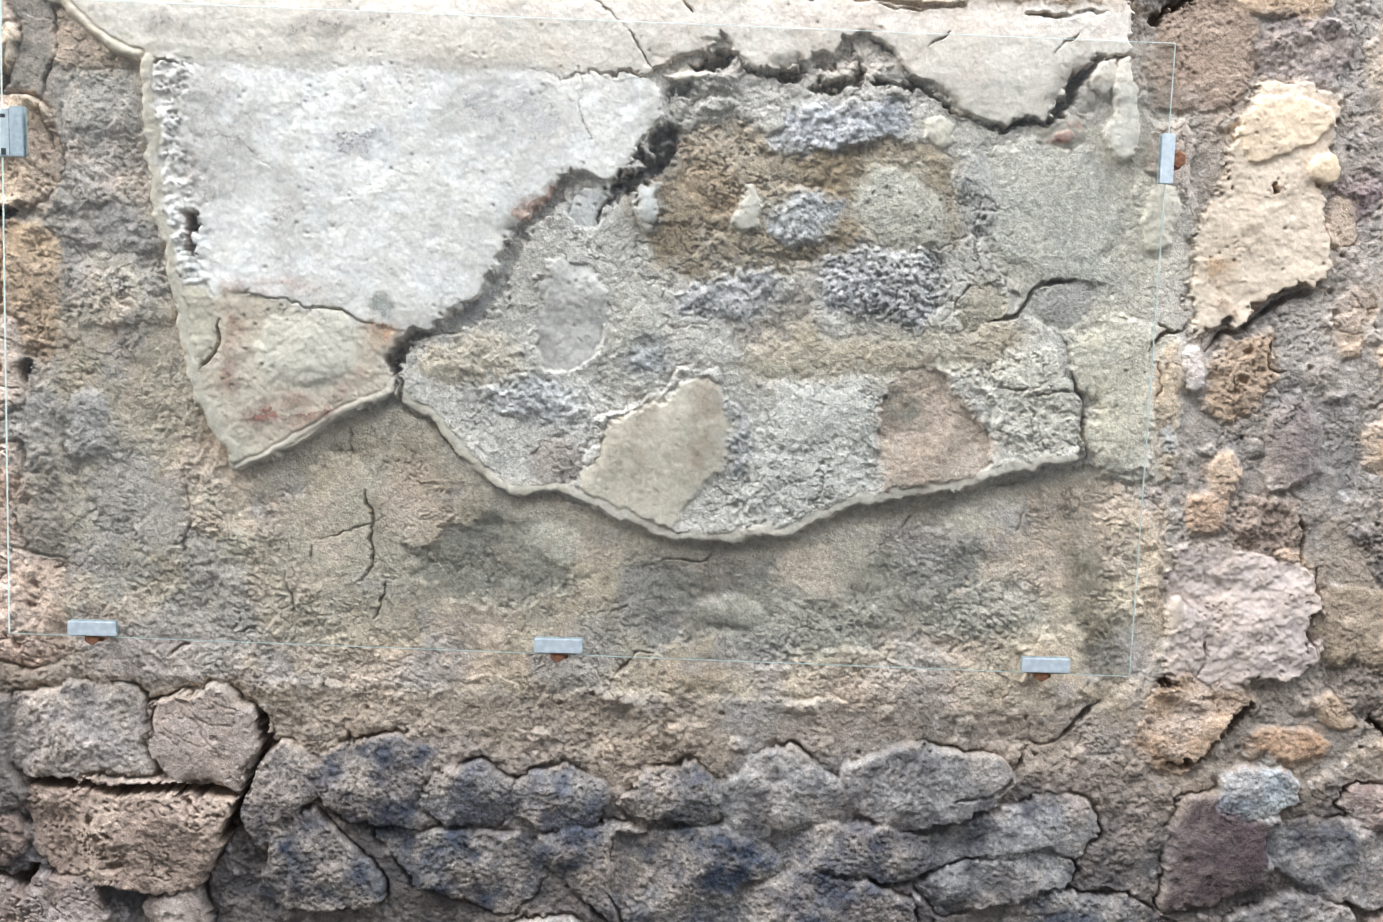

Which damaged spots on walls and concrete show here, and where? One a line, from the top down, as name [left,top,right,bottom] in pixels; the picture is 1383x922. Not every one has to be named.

crack [0,11,59,152]
crack [577,66,594,142]
crack [594,0,1121,226]
crack [198,182,567,406]
spalling [396,32,1140,535]
crack [953,285,973,313]
crack [987,279,1076,324]
peeling [1143,184,1181,253]
crack [999,338,1118,503]
crack [238,490,397,653]
crack [990,481,1028,534]
crack [166,642,191,659]